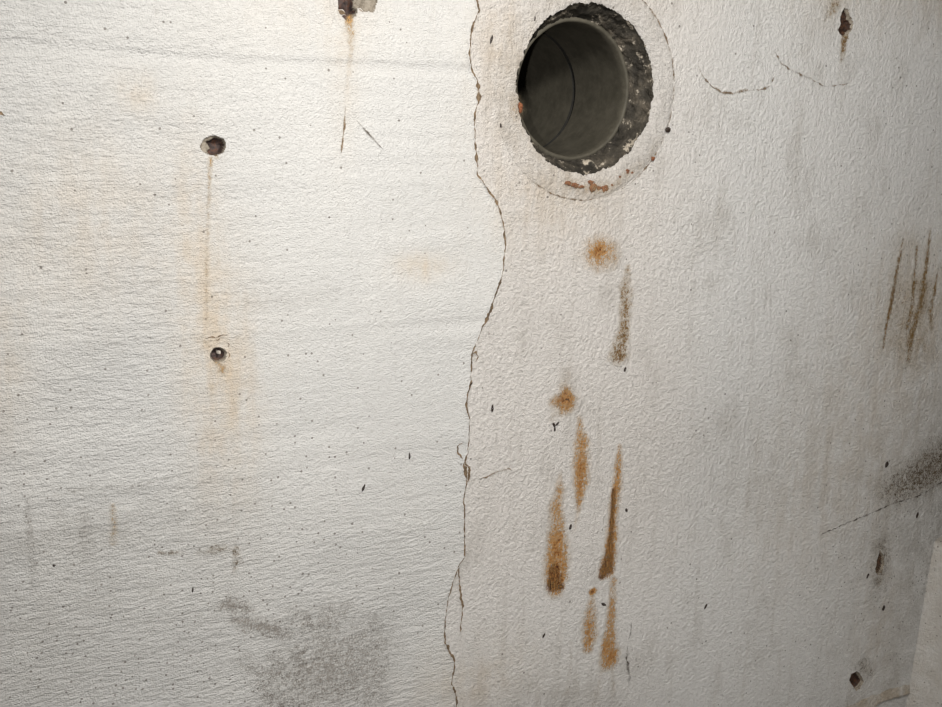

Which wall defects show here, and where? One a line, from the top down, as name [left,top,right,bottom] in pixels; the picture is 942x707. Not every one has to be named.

spalling [330,0,385,35]
crack [705,52,845,94]
crack [443,0,510,707]
rust [610,266,631,362]
rust [551,387,575,411]
rust [574,422,589,506]
leakage [881,441,942,503]
rust [546,484,568,595]
rust [583,450,621,669]
leakage [221,597,289,638]
leakage [249,606,385,707]
spalling [845,658,872,696]